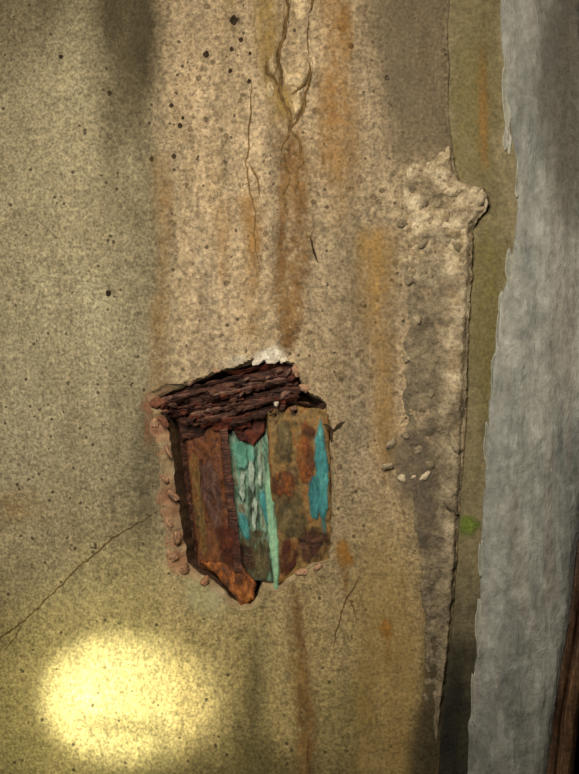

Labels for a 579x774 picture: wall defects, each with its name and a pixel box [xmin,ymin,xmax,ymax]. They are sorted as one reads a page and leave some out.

crack [244,0,314,263]
corrosion [277,133,307,349]
crack [0,507,161,648]
spalling [144,355,336,611]
corrosion [160,362,353,605]